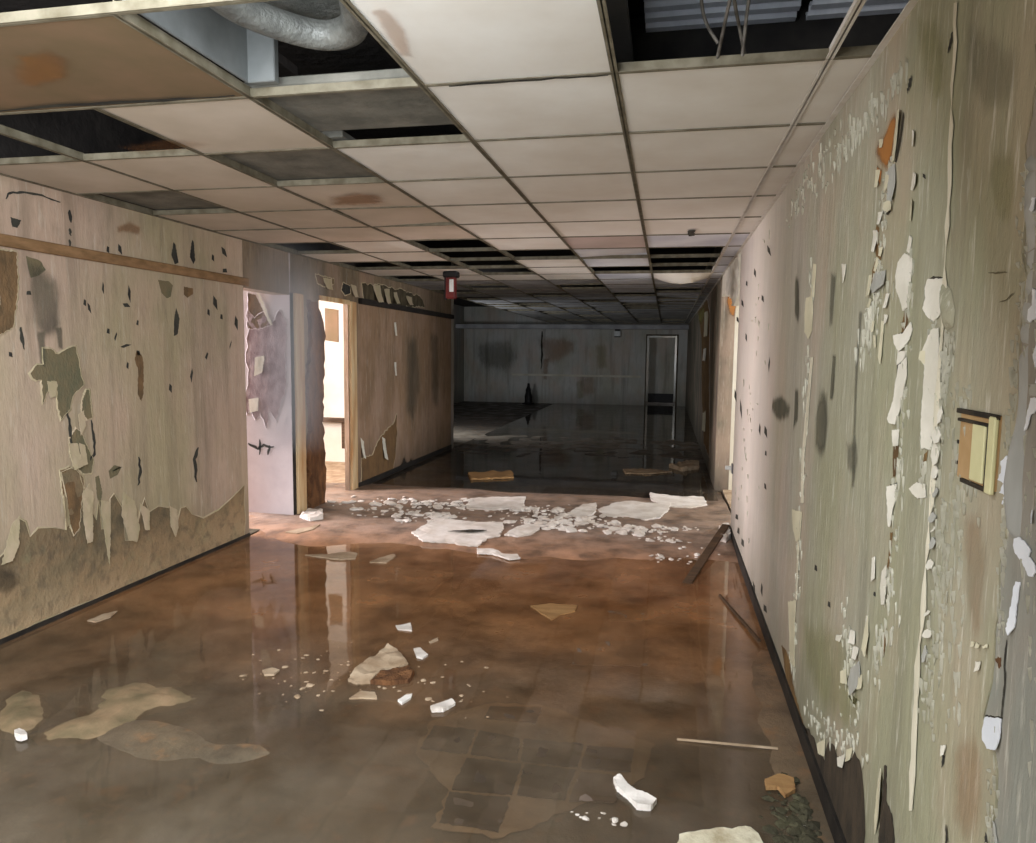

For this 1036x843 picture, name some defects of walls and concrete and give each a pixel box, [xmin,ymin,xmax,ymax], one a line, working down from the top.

peeling [171,240,195,264]
peeling [0,248,46,337]
peeling [158,280,193,298]
peeling [315,273,425,308]
peeling [107,328,144,400]
peeling [207,292,288,428]
flaking render [305,300,327,509]
peeling [361,413,397,482]
peeling [734,379,767,437]
peeling [781,42,1036,843]
peeling [0,345,246,639]